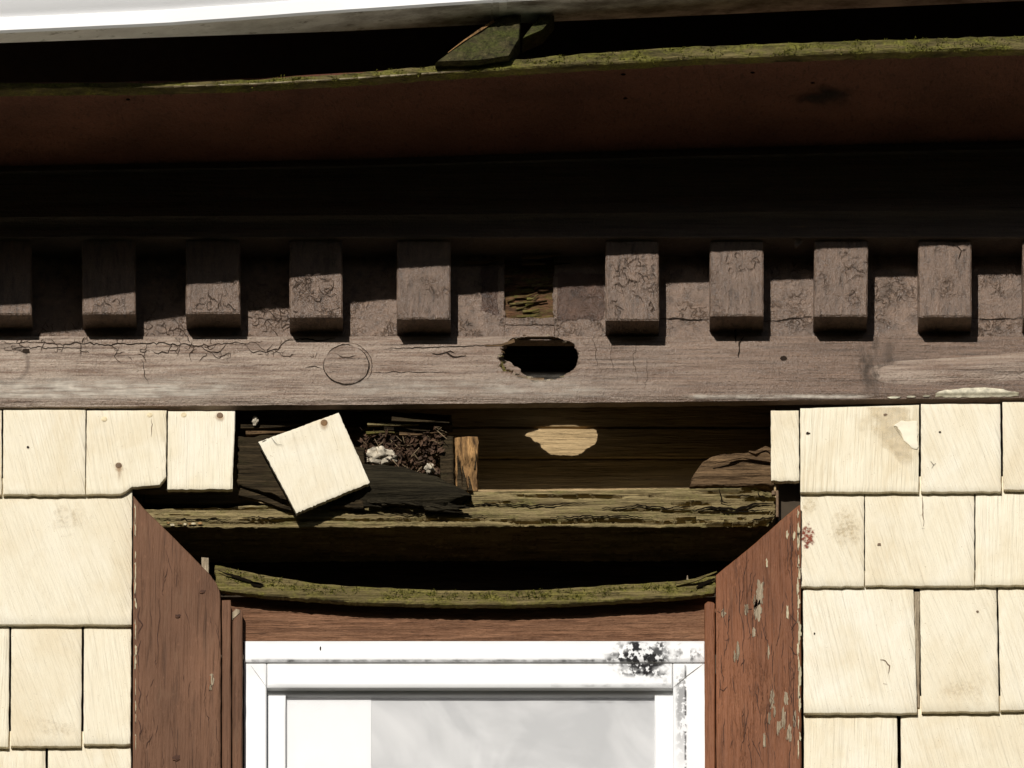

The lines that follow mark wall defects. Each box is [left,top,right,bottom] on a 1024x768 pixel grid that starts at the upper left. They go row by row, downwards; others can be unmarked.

crack [584,254,707,320]
crack [839,252,865,296]
crack [1,277,490,385]
water stain [562,641,666,676]
peeling [743,580,764,637]
peeling [762,510,802,758]